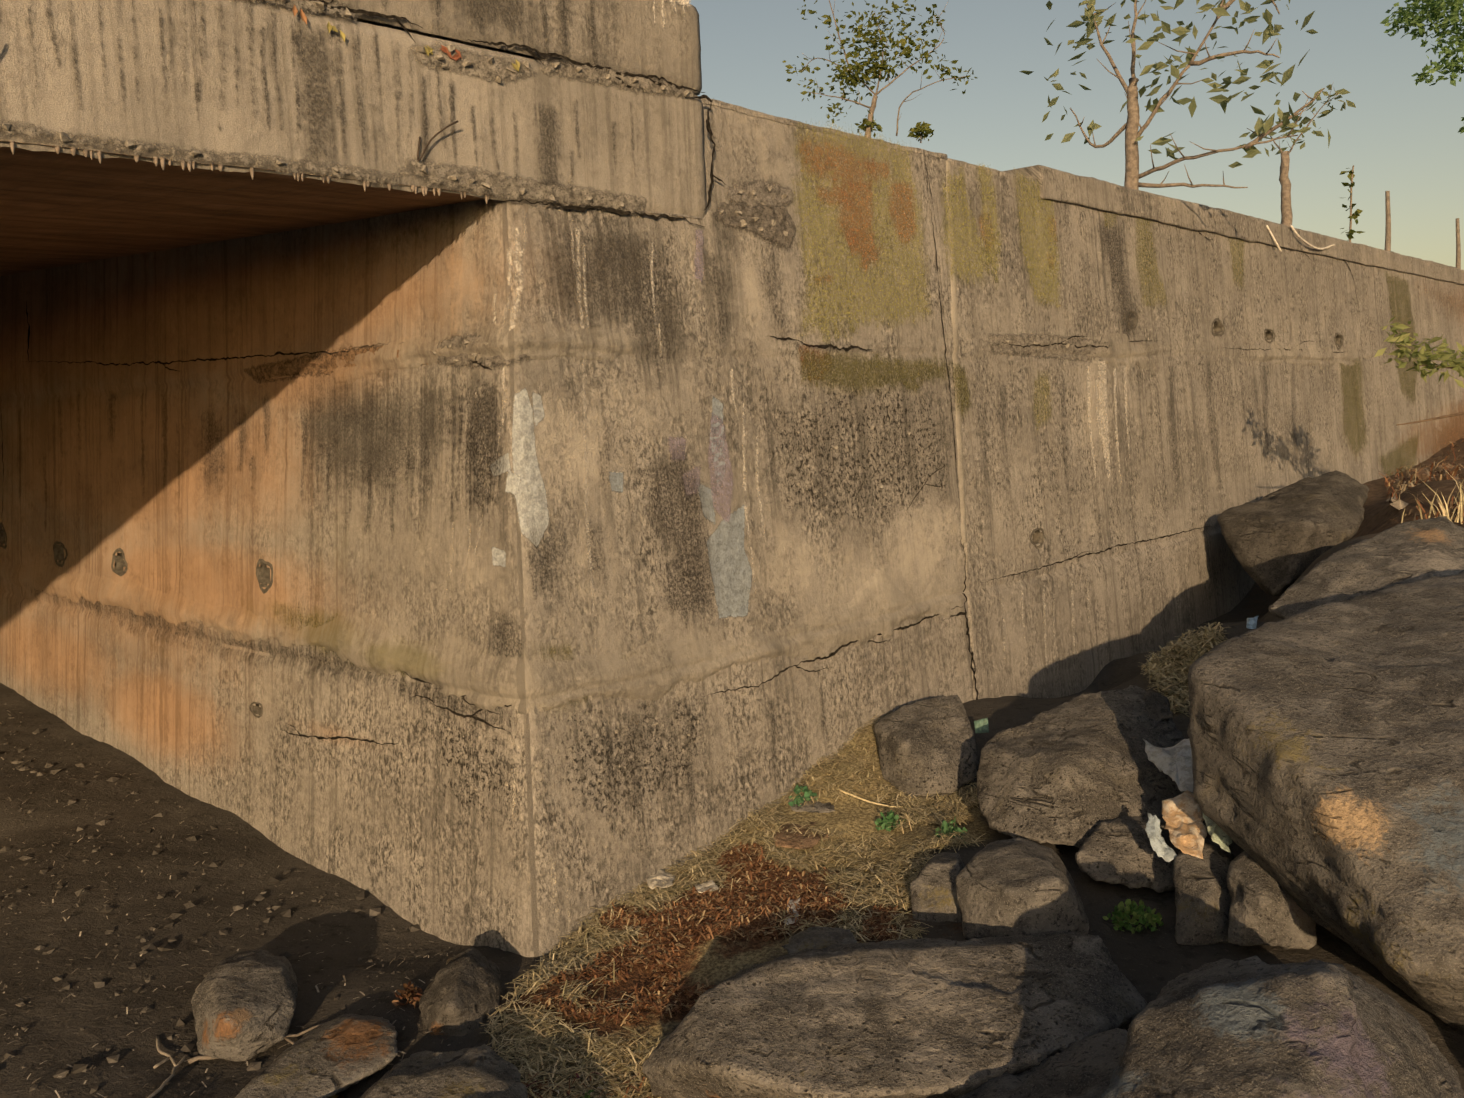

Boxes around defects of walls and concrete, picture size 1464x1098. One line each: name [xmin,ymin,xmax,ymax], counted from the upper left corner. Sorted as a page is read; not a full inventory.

spalling [0,120,646,216]
crack [463,39,725,227]
crack [22,301,387,371]
damp [494,228,523,330]
damp [1103,213,1137,338]
damp [1386,273,1417,404]
damp [452,368,505,555]
crack [704,153,1209,700]
damp [1086,361,1130,478]
crack [393,671,512,730]